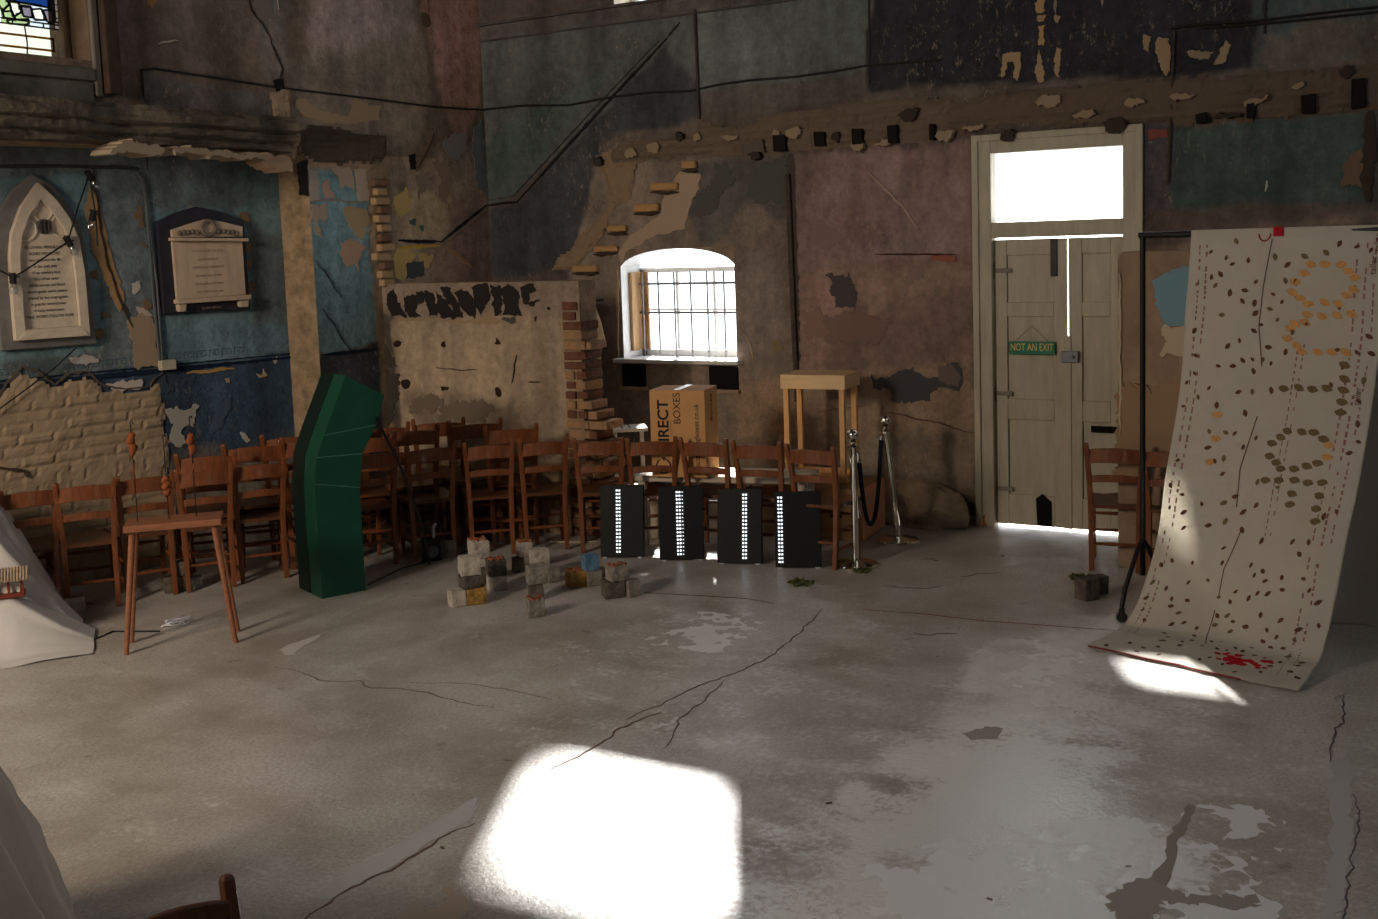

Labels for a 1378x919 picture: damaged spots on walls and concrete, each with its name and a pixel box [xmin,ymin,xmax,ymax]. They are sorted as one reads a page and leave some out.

peeling [90,78,434,284]
peeling [552,0,1378,271]
peeling [0,185,199,586]
crack [644,592,774,604]
crack [551,608,823,770]
crack [1329,694,1346,762]
water stain [858,802,1286,919]
crack [1342,794,1360,919]